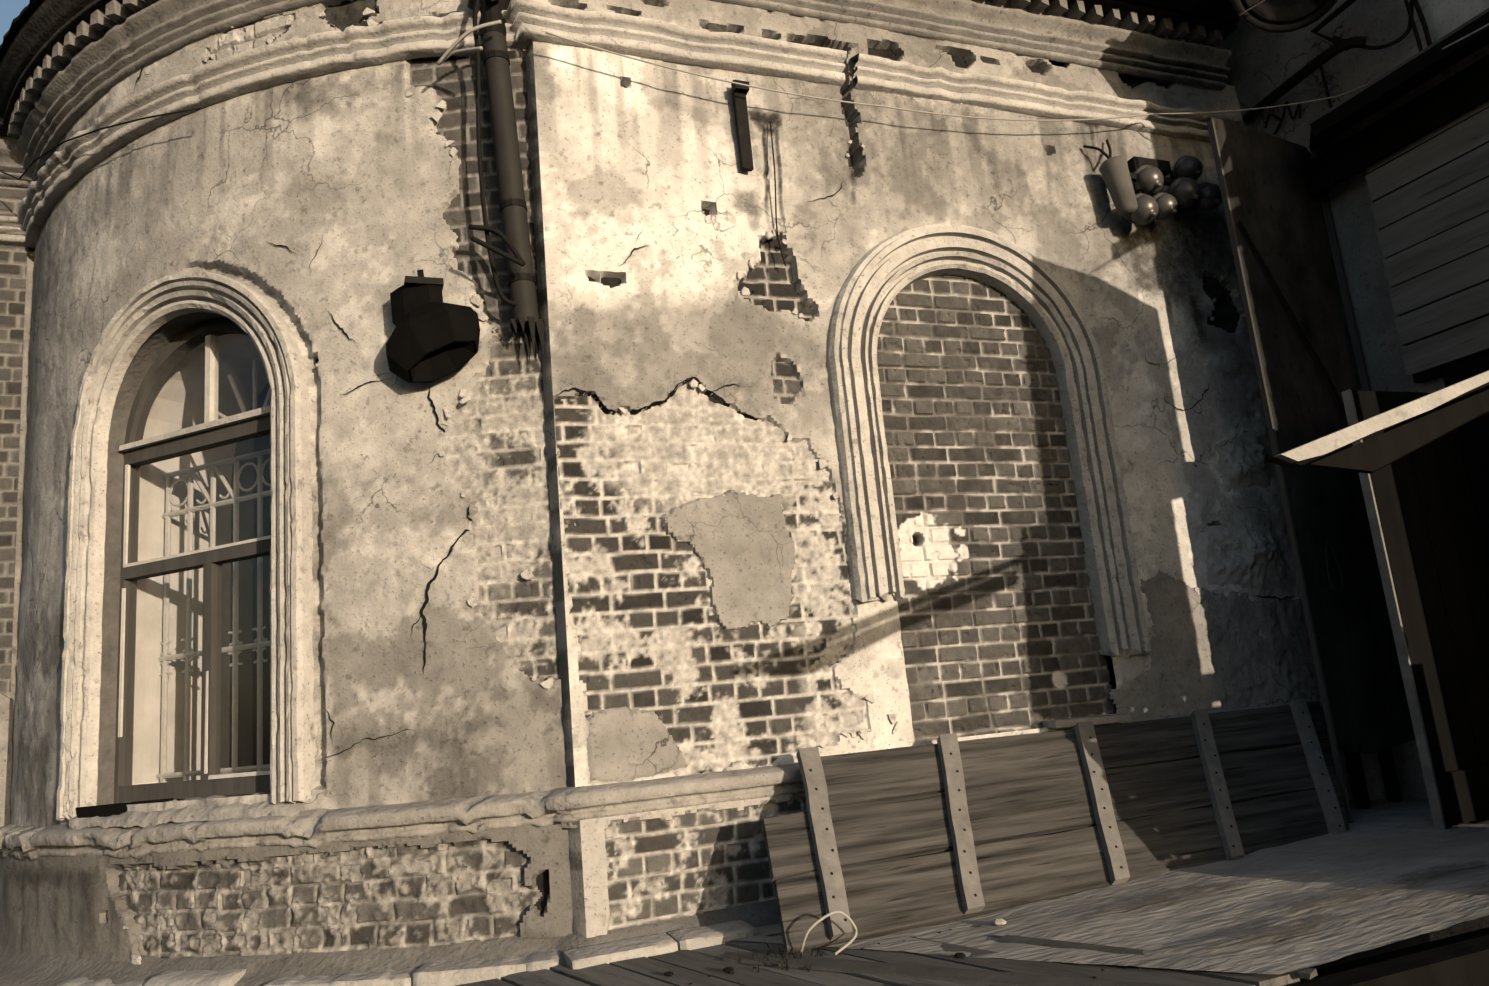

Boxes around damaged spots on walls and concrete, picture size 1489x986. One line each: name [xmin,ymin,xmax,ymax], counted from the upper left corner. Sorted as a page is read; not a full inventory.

flaking render [320,0,380,32]
spalling [868,48,898,61]
spalling [951,56,969,69]
flaking render [1203,275,1247,333]
flaking render [406,55,875,774]
crack [411,505,472,675]
flaking render [889,714,899,734]
flaking render [605,799,807,930]
flaking render [115,840,549,965]